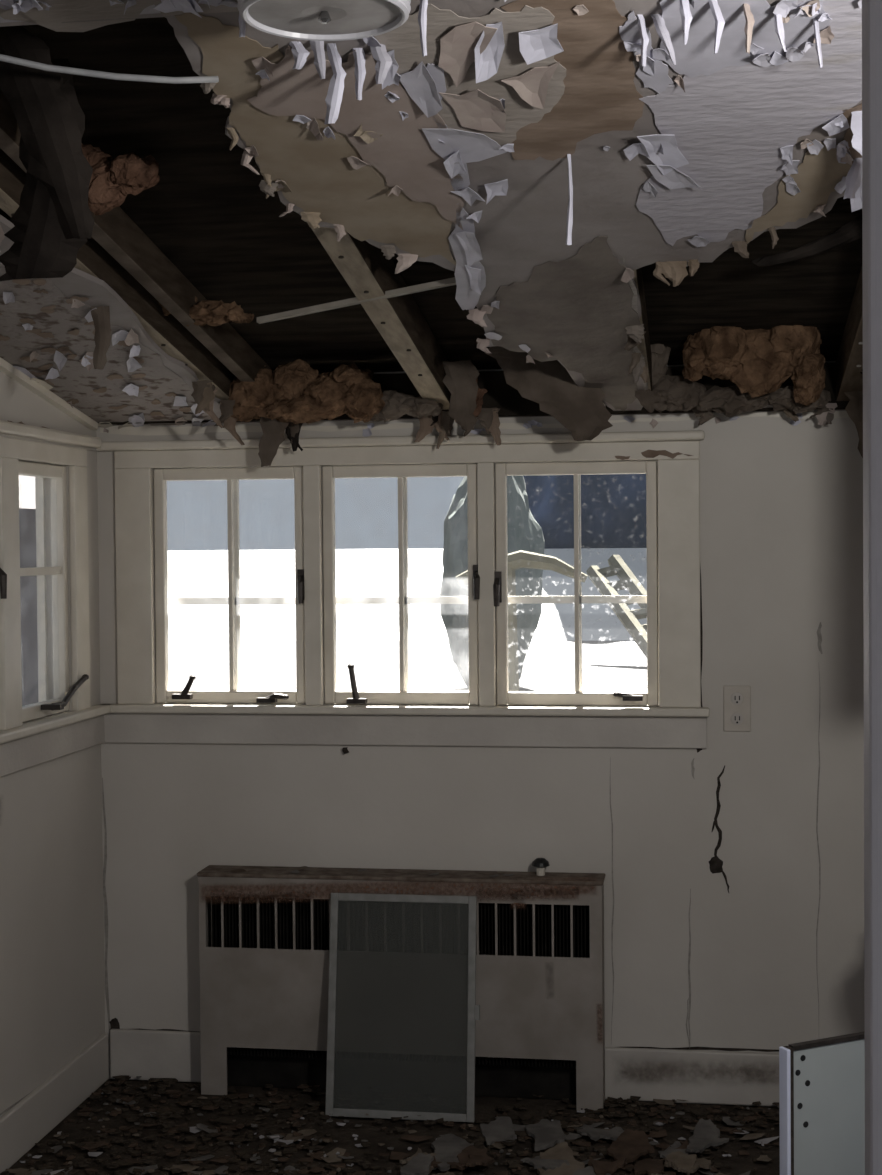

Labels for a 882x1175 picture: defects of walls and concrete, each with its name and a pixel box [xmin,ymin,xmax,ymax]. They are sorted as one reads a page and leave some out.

peeling [0,0,862,437]
crack [610,757,779,1052]